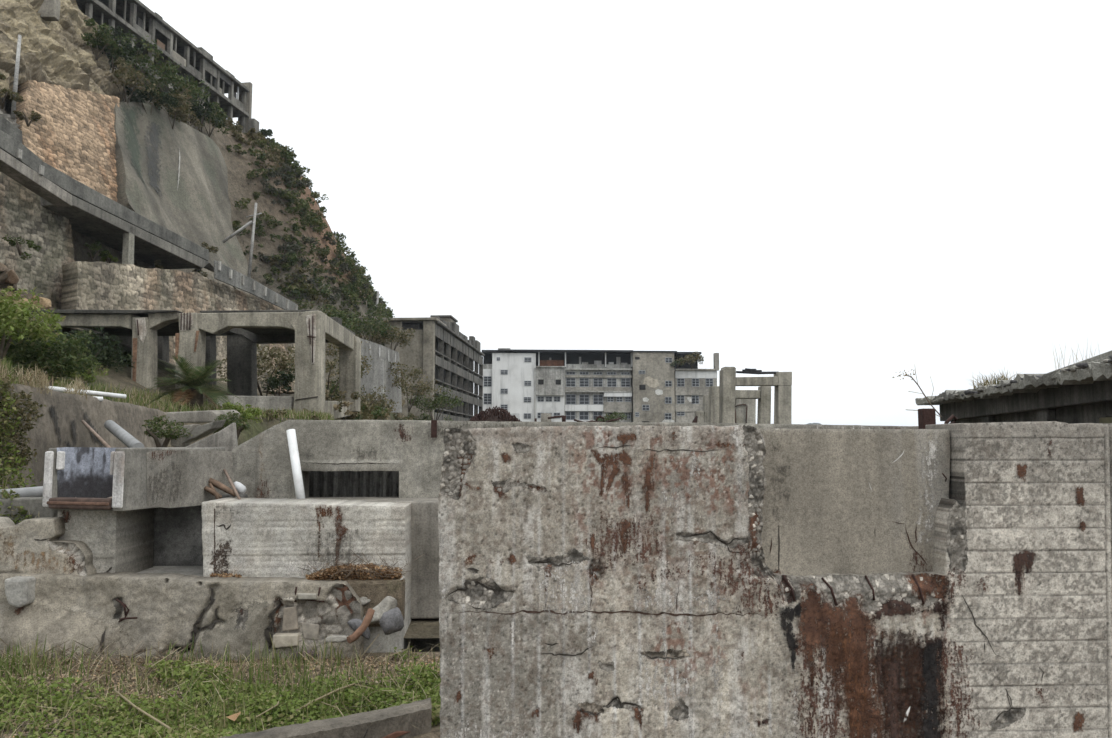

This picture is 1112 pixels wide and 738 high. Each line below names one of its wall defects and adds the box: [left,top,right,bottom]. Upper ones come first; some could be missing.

spalling [440,428,477,500]
spalling [112,597,137,622]
crack [139,509,231,653]
spalling [268,584,361,658]
rust [316,505,348,566]
crack [540,643,591,656]
crack [445,561,763,617]
crack [677,528,780,579]
rust [535,415,989,738]
spalling [676,425,968,615]
rust [1013,550,1036,595]
rust [1076,487,1086,532]